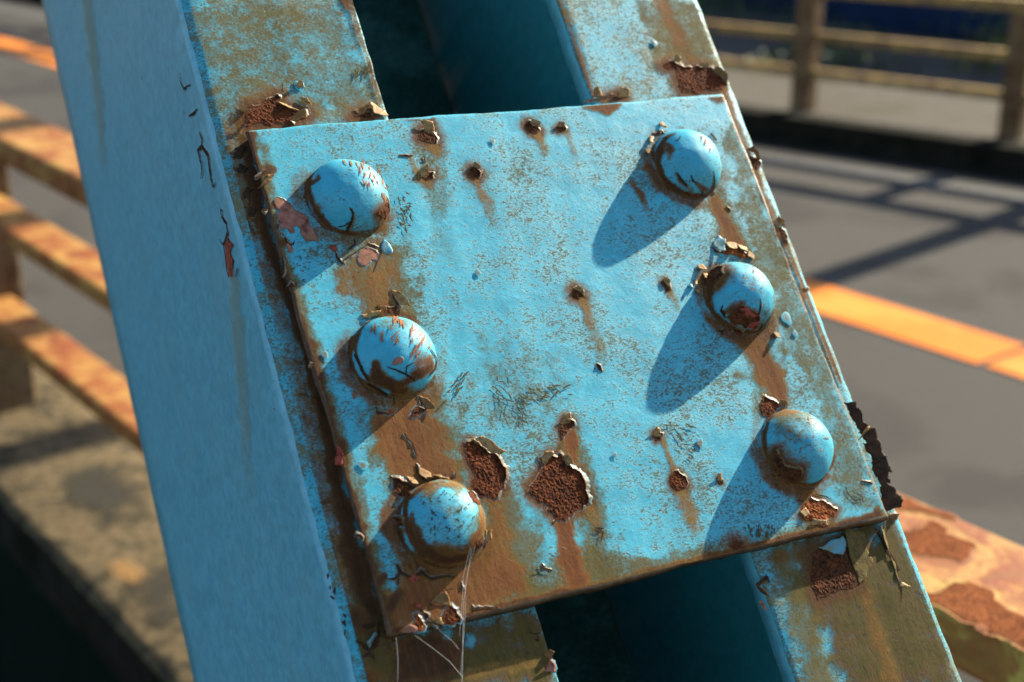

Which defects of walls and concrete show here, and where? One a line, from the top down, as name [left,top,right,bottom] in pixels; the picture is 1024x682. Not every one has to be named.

peeling [219,209,237,278]
peeling [367,383,436,419]
corrosion [222,87,883,682]
peeling [390,412,600,589]
peeling [763,401,1024,651]